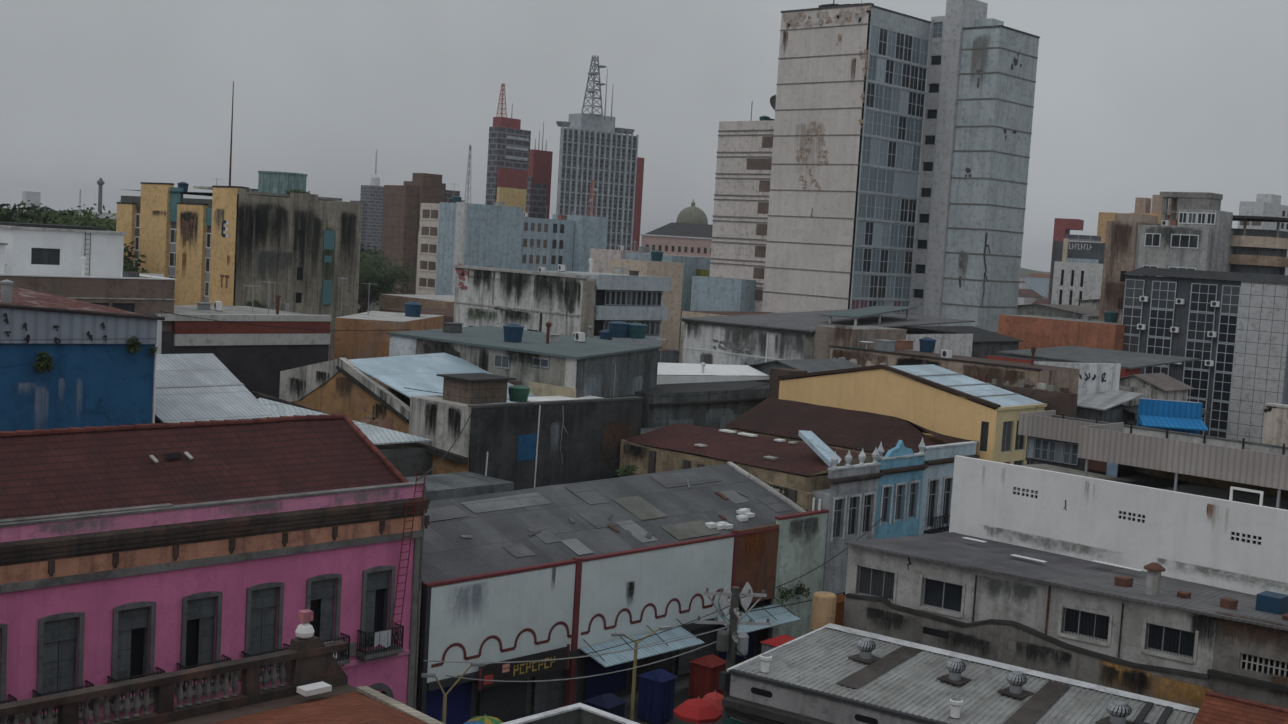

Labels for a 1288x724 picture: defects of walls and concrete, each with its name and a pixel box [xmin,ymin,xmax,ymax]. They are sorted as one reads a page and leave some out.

leakage [214,204,356,280]
leakage [468,270,580,323]
leakage [867,608,908,629]
leakage [941,630,990,655]
leakage [1017,643,1071,665]
leakage [1102,666,1148,695]